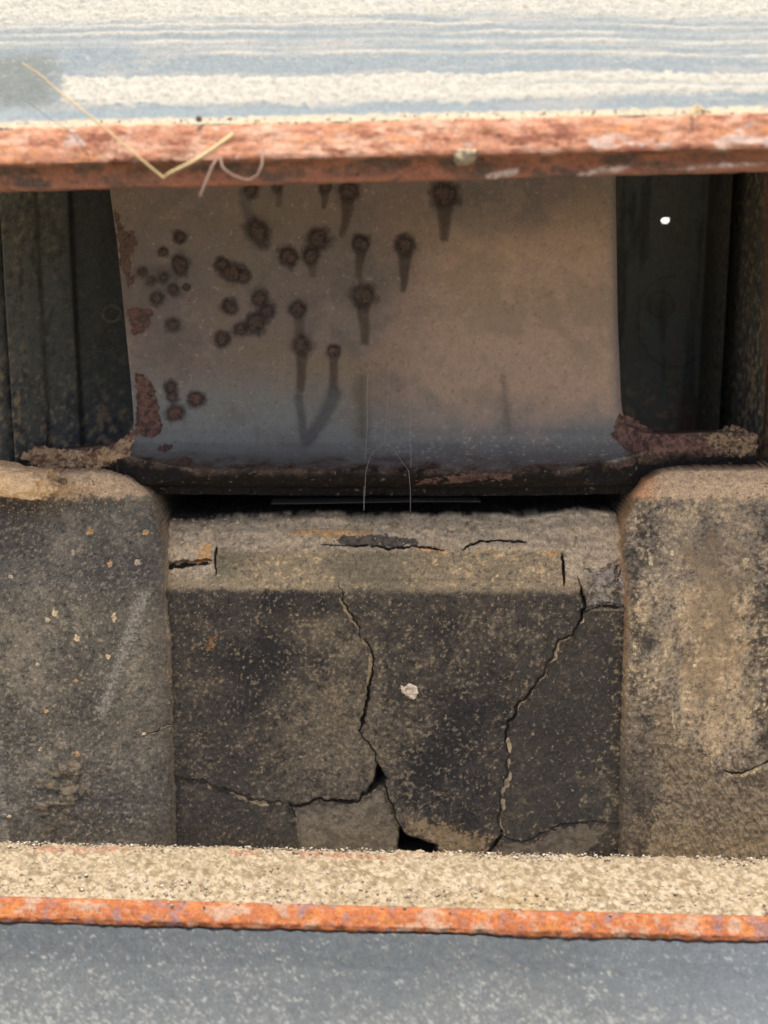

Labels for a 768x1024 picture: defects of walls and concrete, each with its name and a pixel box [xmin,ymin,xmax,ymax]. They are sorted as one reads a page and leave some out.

corrosion [0,112,768,168]
corrosion [114,212,190,335]
corrosion [215,256,275,348]
corrosion [279,183,375,344]
corrosion [134,373,206,453]
corrosion [611,414,739,468]
crack [169,546,218,574]
crack [320,539,527,551]
spalling [587,563,622,607]
crack [197,581,405,833]
crack [485,554,621,854]
corrosion [0,896,768,943]